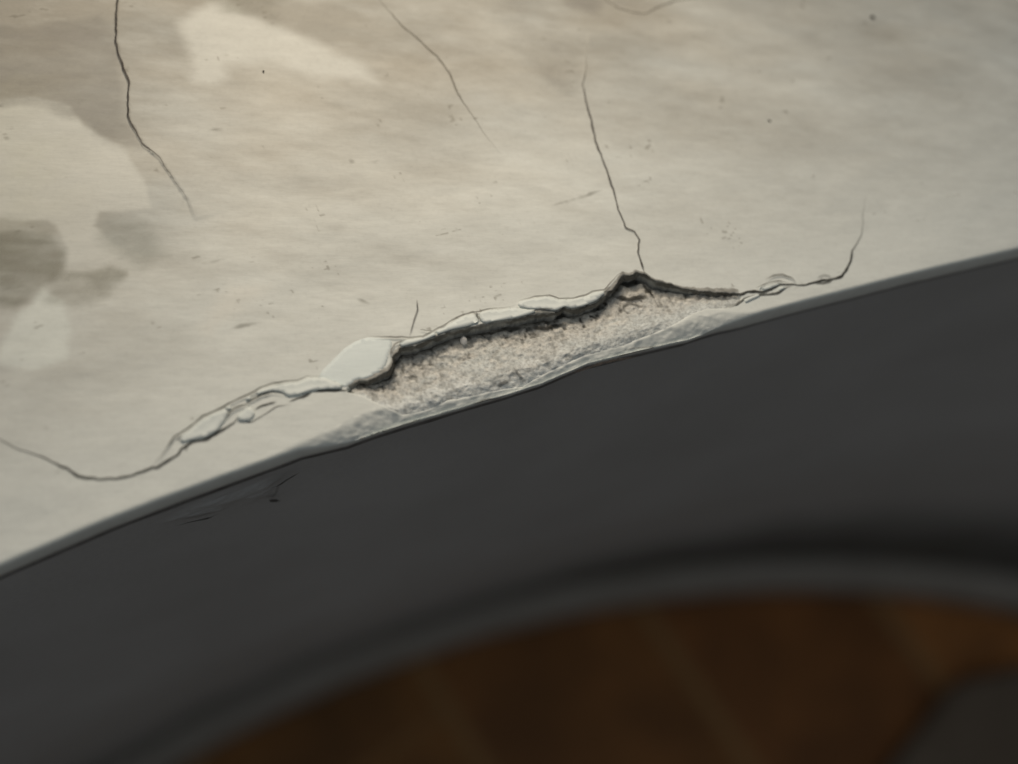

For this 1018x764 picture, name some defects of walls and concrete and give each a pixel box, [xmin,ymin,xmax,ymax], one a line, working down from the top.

crack [114,0,154,152]
crack [394,17,463,101]
crack [582,84,643,267]
crack [0,243,857,580]
spalling [319,272,740,415]